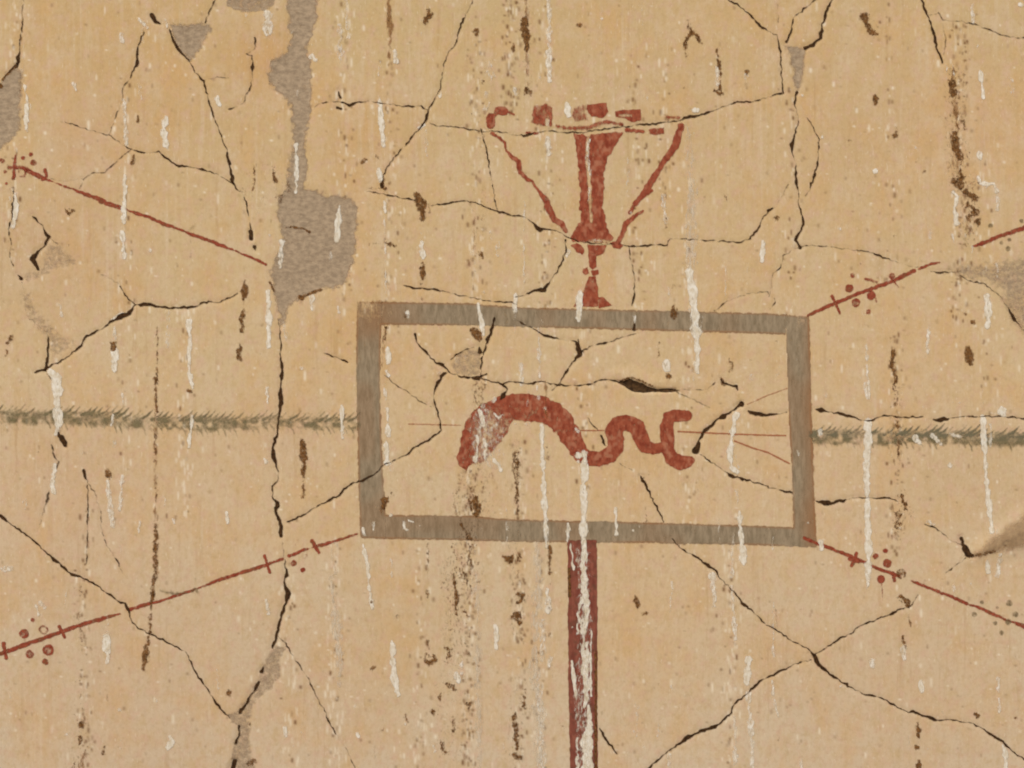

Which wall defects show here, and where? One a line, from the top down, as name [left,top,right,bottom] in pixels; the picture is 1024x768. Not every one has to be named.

flaking render [0,66,22,148]
flaking render [169,24,211,62]
flaking render [227,0,358,325]
corrosion [511,7,530,52]
corrosion [948,74,981,231]
crack [271,0,897,537]
water stain [685,184,702,374]
water stain [566,450,589,561]
water stain [863,418,873,587]
corrosion [142,510,159,671]
crack [0,469,336,768]
crack [640,476,1024,768]